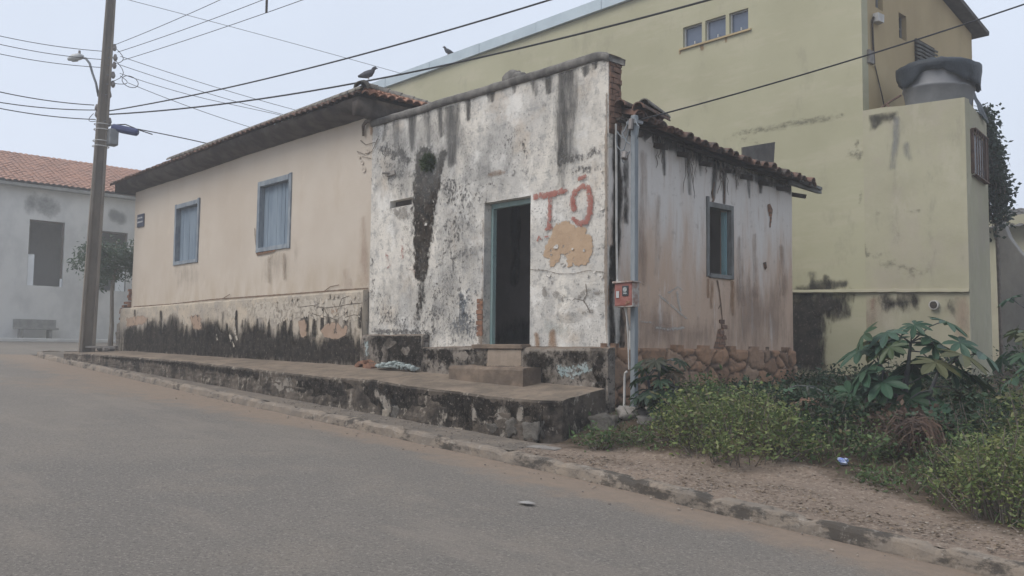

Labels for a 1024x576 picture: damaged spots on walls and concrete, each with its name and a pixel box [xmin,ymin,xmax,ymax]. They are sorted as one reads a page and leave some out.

leakage [382,99,470,207]
leakage [532,62,597,162]
leakage [870,113,898,151]
peeling [216,169,521,369]
peeling [542,93,607,345]
leakage [103,307,477,380]
leakage [793,276,850,373]
leakage [290,376,543,443]